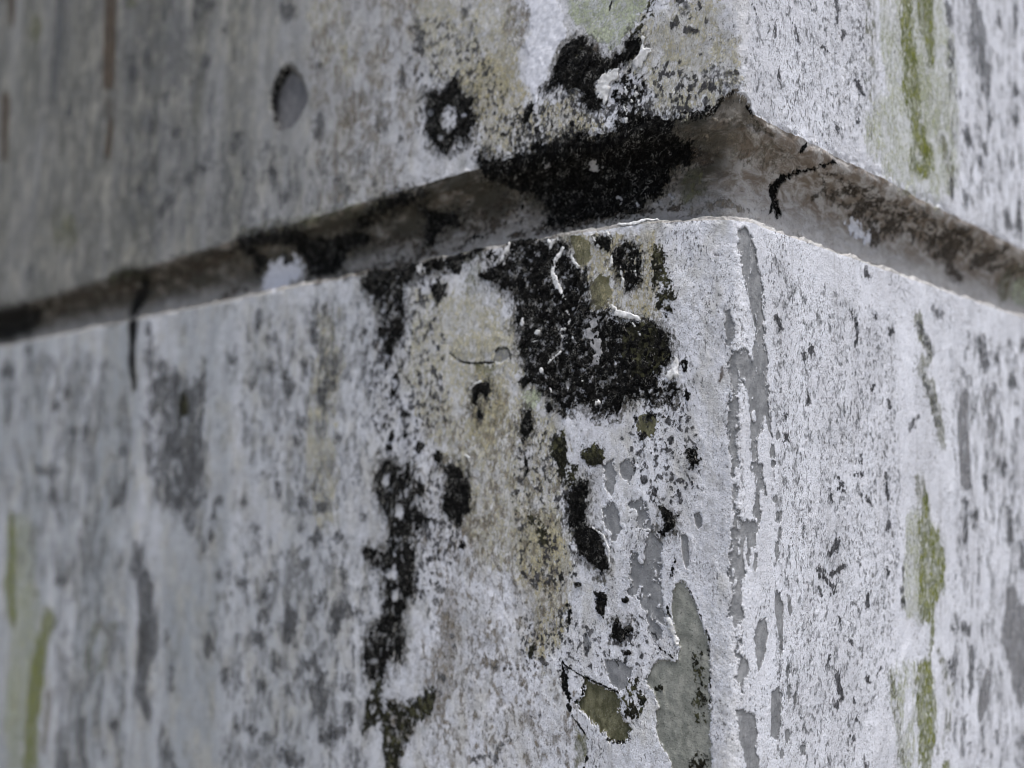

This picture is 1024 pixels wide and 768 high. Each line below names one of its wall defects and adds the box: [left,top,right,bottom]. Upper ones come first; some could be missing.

water stain [746,0,874,139]
water stain [818,0,1024,302]
water stain [0,0,747,768]
peeling [576,458,713,768]
peeling [724,226,806,768]
water stain [908,304,1024,768]